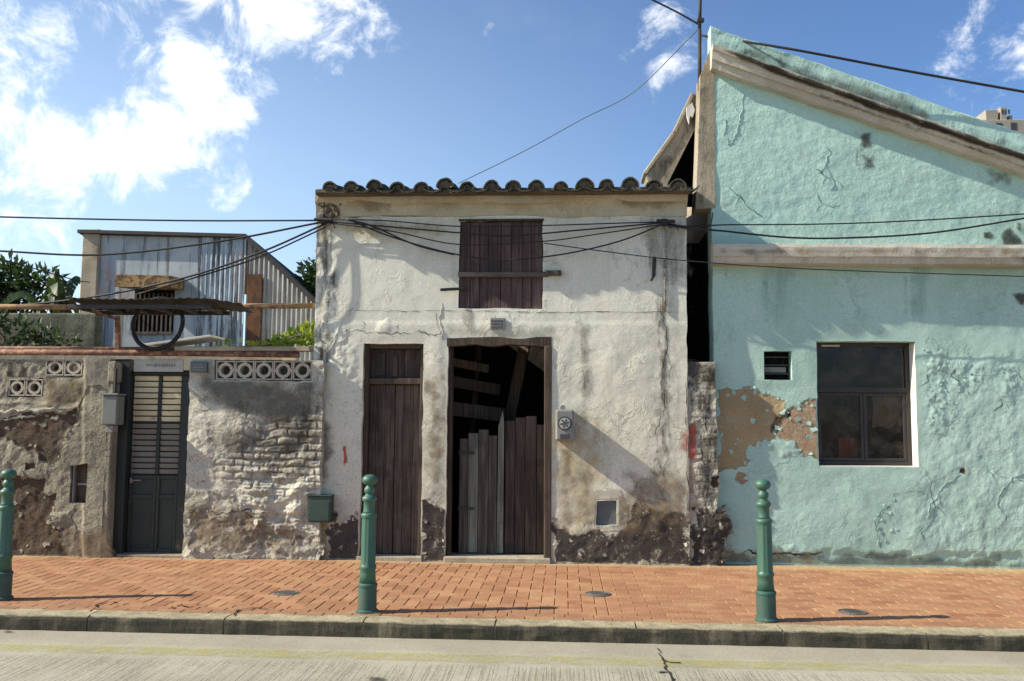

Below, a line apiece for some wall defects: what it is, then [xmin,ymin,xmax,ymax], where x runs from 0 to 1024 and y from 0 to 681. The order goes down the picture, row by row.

crack [817,156,843,212]
mould [862,134,872,167]
damp [726,50,1024,161]
crack [354,310,610,339]
flaking render [0,409,79,555]
flaking render [186,443,358,560]
damp [620,360,717,530]
crack [644,291,716,527]
peeling [711,386,818,488]
crack [874,473,953,548]
crack [657,648,681,681]